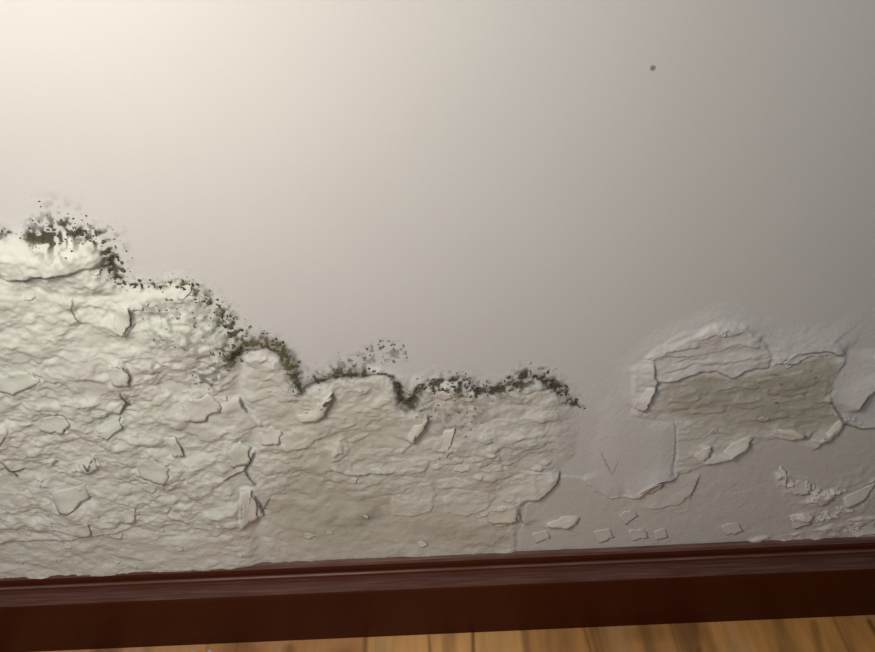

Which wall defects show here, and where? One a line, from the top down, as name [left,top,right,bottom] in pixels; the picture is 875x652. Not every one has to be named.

crack [227,453,269,515]
damp [0,201,586,437]
peeling [0,211,875,579]